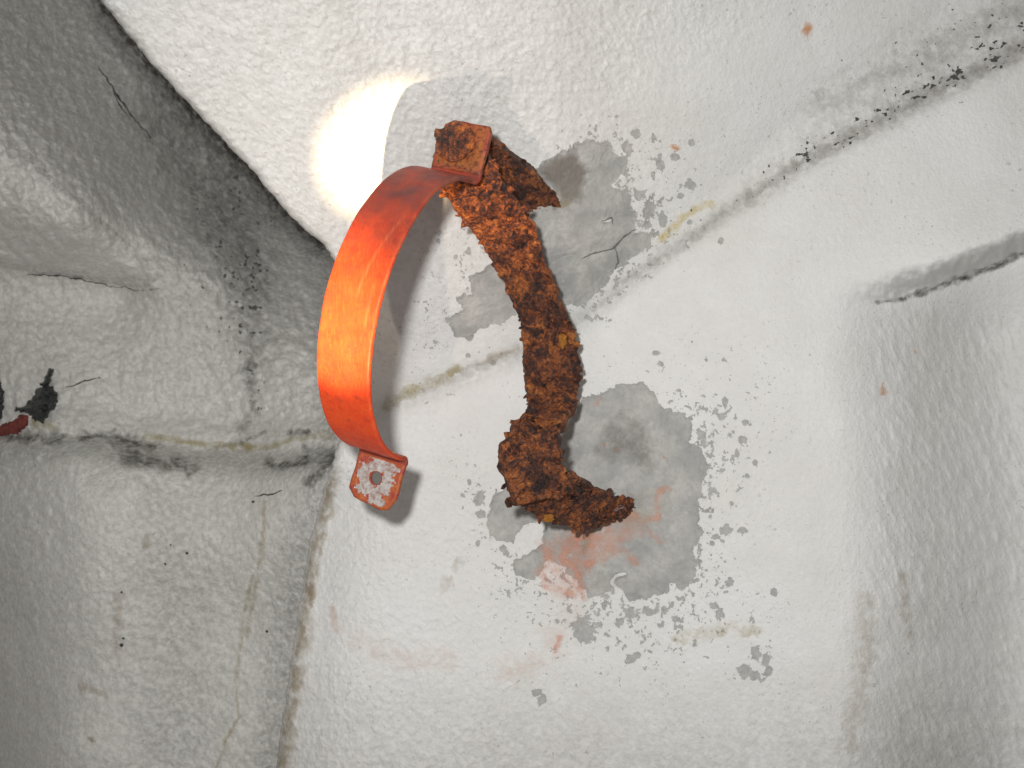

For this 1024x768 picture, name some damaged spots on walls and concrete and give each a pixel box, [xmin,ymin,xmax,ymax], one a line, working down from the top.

leakage [971,3,1024,71]
crack [97,65,151,138]
leakage [763,54,966,188]
crack [28,274,159,291]
leakage [218,249,268,354]
peeling [411,228,521,384]
crack [582,217,636,269]
peeling [527,114,702,327]
peeling [452,350,787,694]
peeling [516,681,546,707]